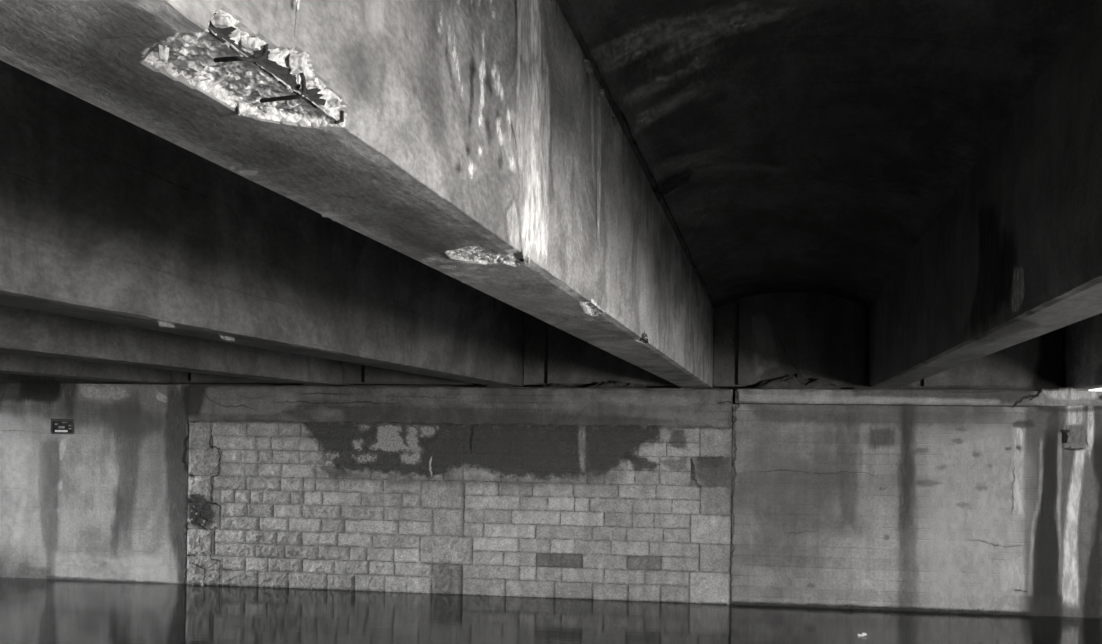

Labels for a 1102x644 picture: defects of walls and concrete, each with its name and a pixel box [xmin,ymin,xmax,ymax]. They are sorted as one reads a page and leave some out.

spalling [144,9,347,128]
spalling [444,246,531,267]
leakage [0,381,379,592]
crack [717,389,739,603]
leakage [644,396,1102,618]